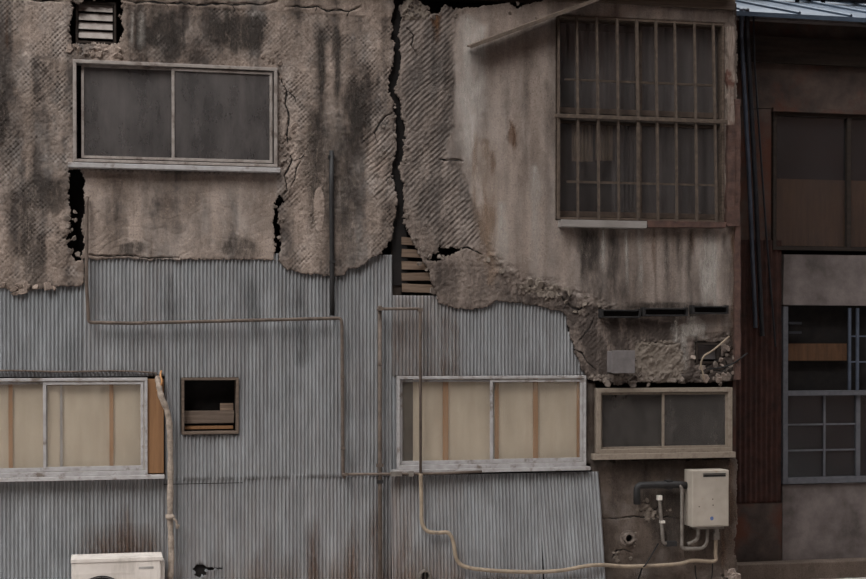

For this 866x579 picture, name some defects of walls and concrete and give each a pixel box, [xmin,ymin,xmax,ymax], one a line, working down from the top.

water stain [210,9,263,53]
spalling [400,0,436,20]
crack [374,0,417,285]
spalling [516,278,601,315]
spalling [589,372,685,388]
spalling [690,332,734,387]